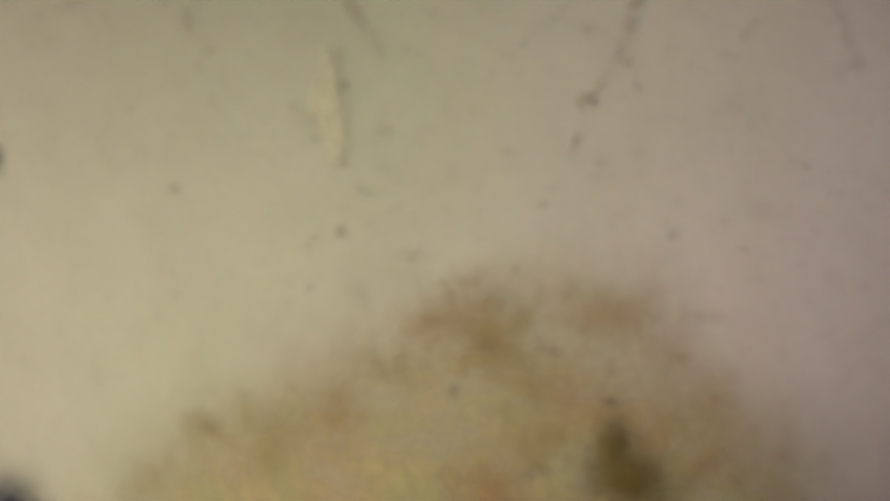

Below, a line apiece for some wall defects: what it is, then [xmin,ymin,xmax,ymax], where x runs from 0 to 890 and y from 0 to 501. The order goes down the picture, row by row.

damp [168,347,769,501]